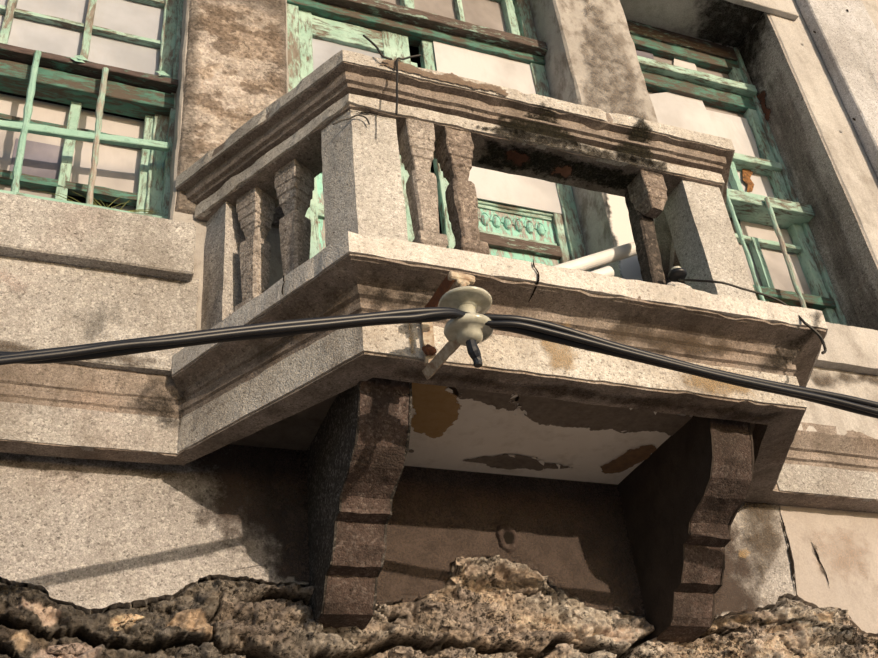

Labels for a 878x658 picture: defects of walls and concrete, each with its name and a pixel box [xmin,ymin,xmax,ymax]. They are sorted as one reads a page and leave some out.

water stain [697,0,765,105]
water stain [477,3,668,193]
crack [528,260,540,302]
water stain [763,312,820,371]
peeling [463,454,574,474]
crack [781,518,796,591]
crack [811,542,830,588]
spalling [0,555,878,658]